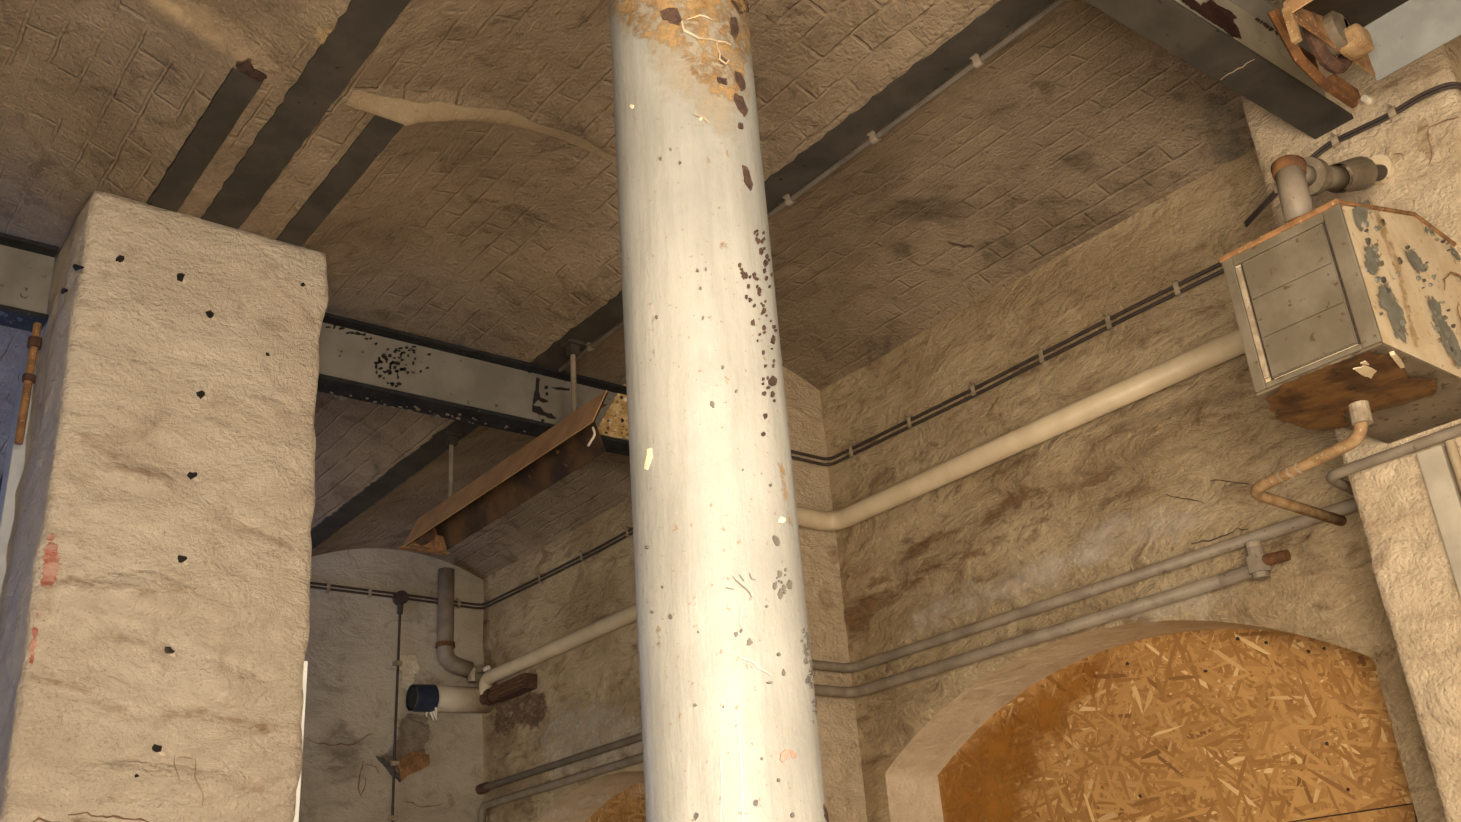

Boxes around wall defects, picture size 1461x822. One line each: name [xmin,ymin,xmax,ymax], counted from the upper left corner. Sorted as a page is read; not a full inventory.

corrosion [611,0,751,119]
peeling [325,325,465,387]
peeling [738,229,778,436]
peeling [505,371,570,432]
crack [173,756,204,806]
crack [33,812,149,822]